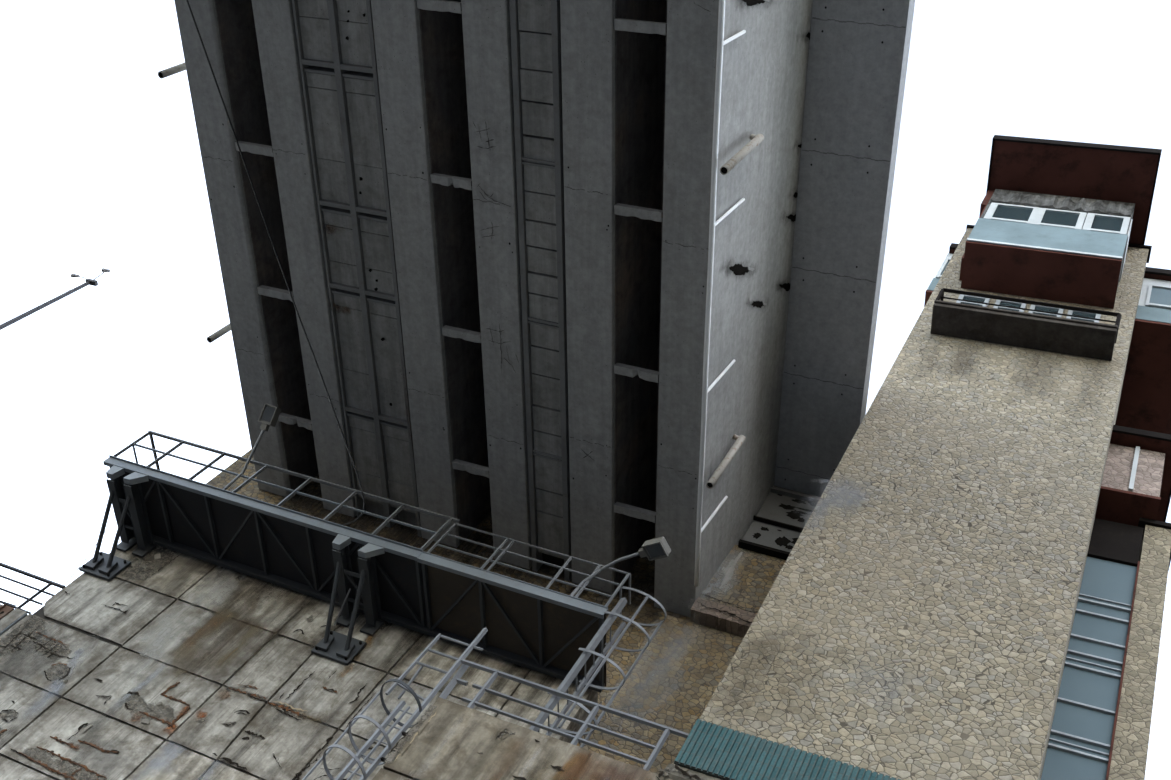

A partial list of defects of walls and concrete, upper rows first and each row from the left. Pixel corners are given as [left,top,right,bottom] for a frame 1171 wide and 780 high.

peeling [777,494,817,523]
peeling [752,527,798,550]
spalling [0,617,75,683]
spalling [125,682,190,734]
spalling [384,705,436,763]
spalling [658,764,702,780]